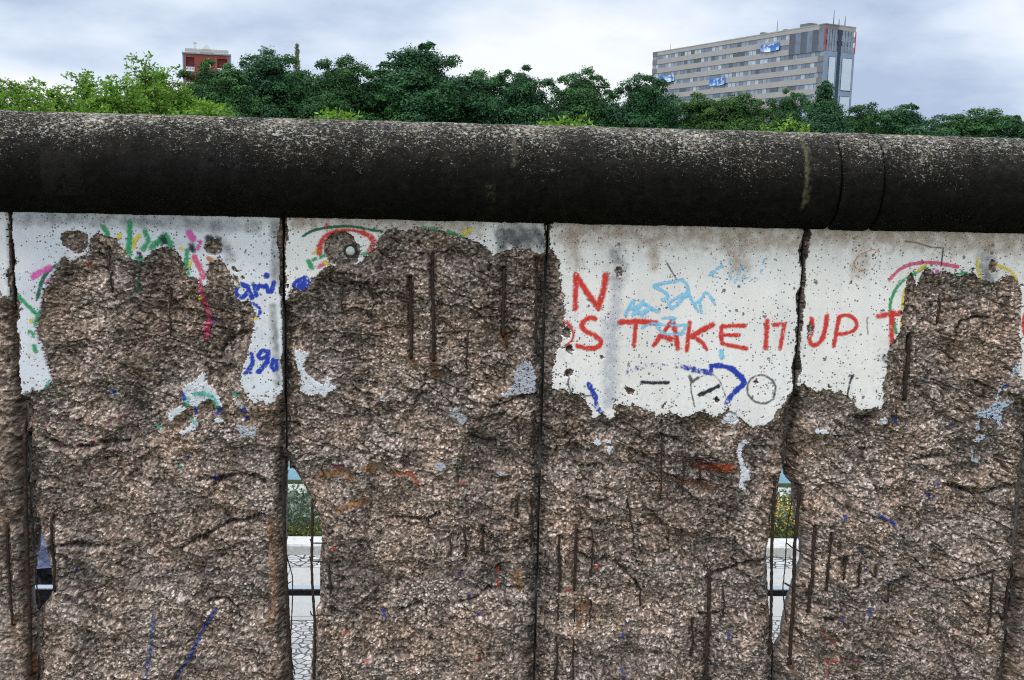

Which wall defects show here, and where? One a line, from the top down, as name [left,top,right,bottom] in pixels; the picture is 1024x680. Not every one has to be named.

spalling [0,213,1024,680]